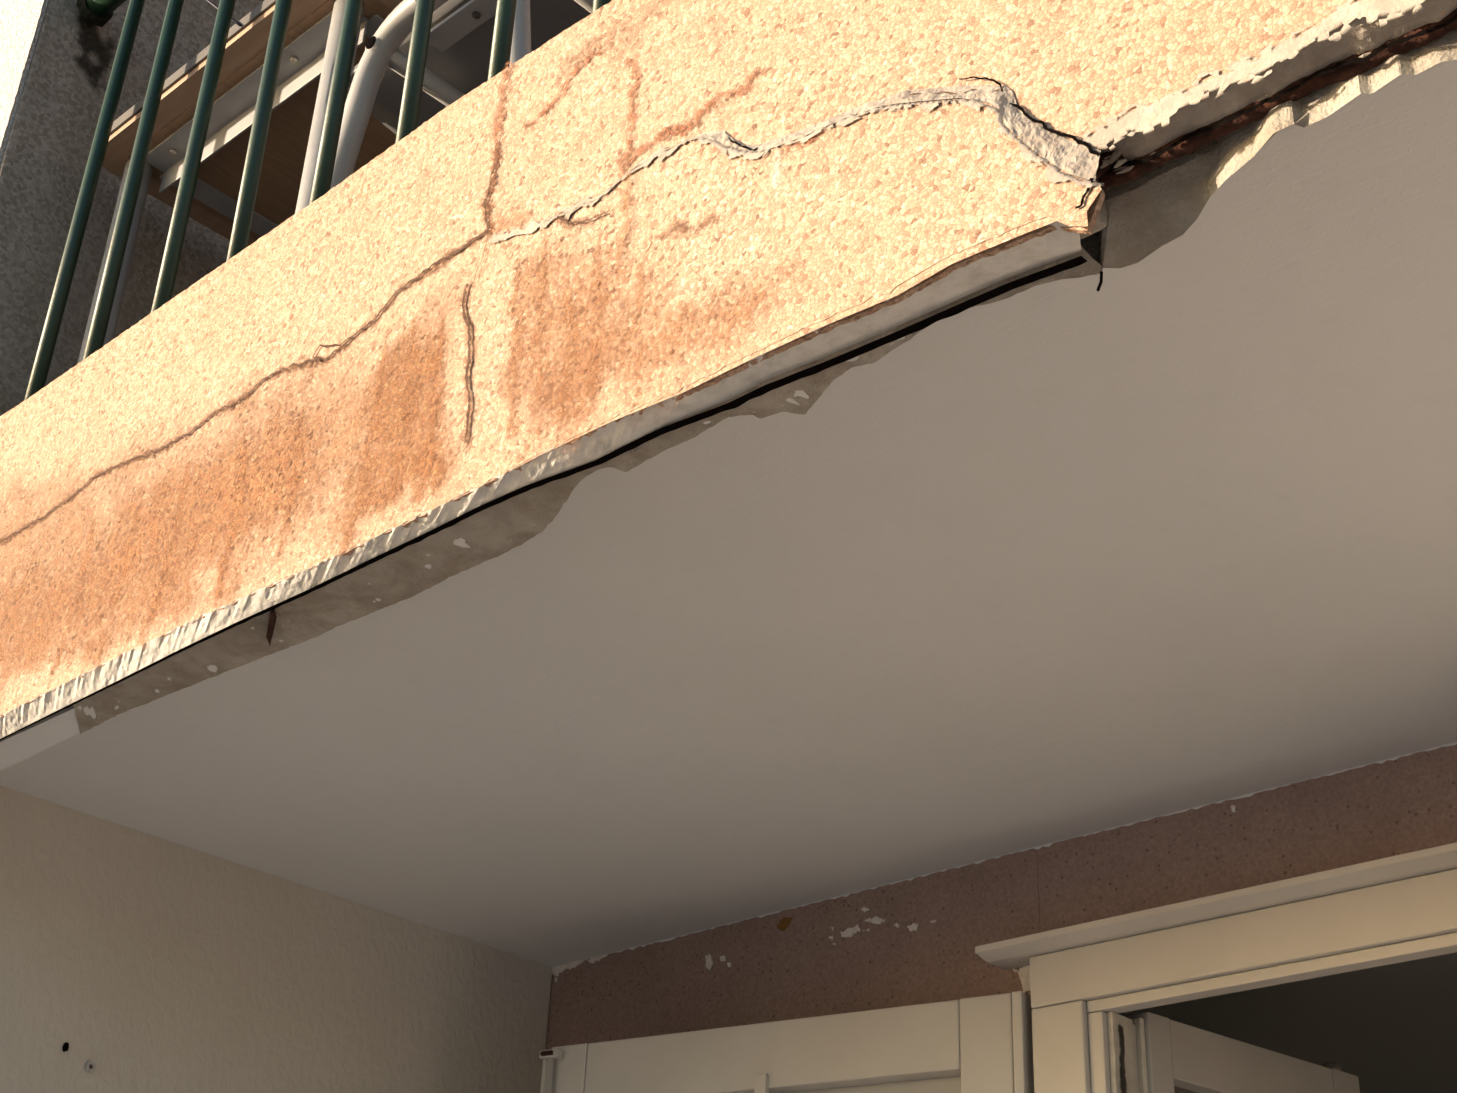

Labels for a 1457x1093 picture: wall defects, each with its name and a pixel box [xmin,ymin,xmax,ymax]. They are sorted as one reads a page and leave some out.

crack [0,62,513,545]
crack [553,208,609,228]
crack [728,137,758,151]
spalling [73,0,1457,734]
crack [910,13,1457,209]
leakage [0,342,435,642]
crack [0,256,1087,740]
peeling [705,953,732,971]
peeling [828,907,937,945]